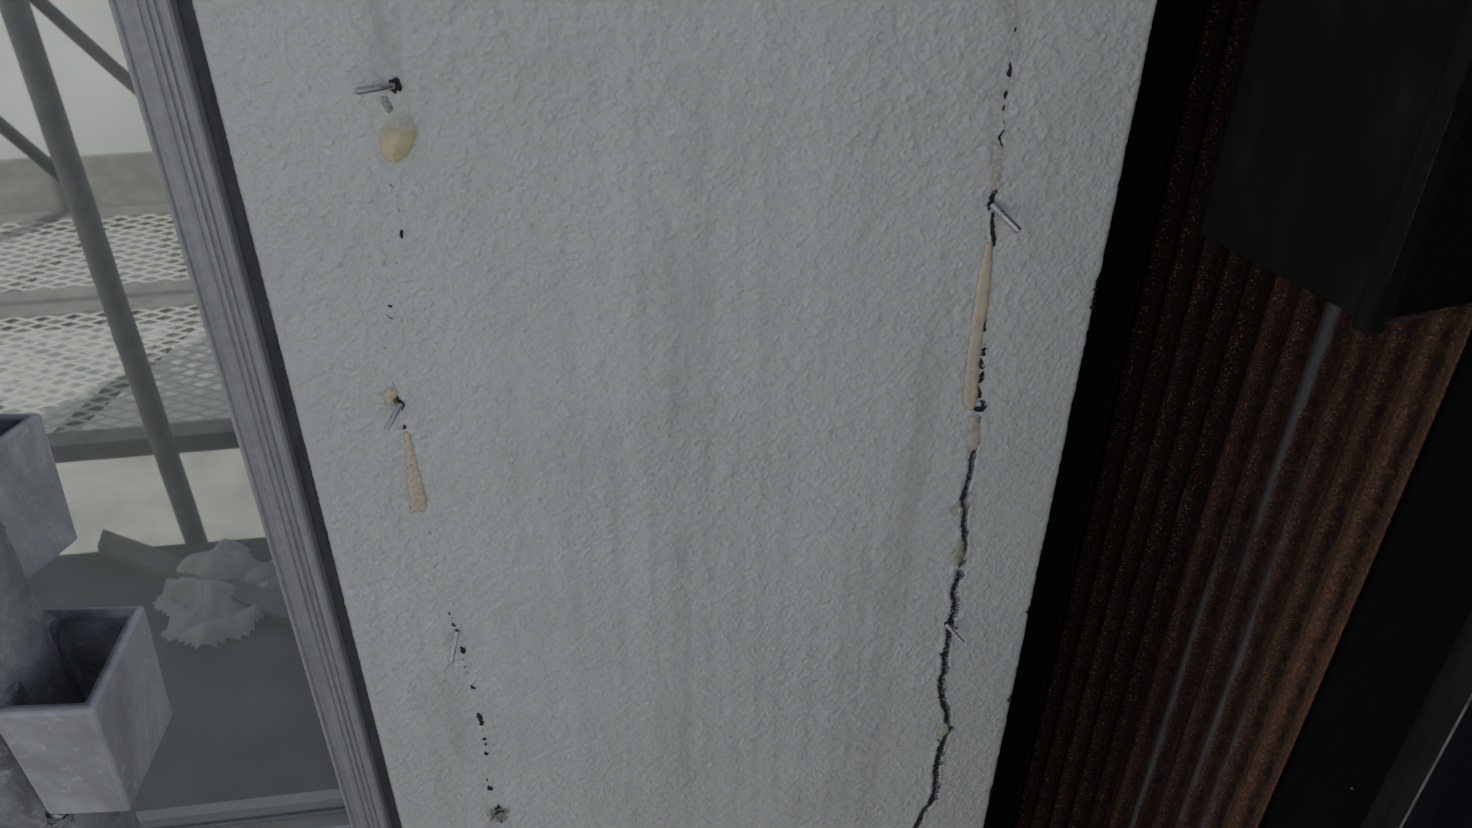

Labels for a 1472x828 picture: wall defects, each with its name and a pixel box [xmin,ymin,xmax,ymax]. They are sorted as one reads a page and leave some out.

crack [998,28,1016,148]
crack [912,189,998,828]